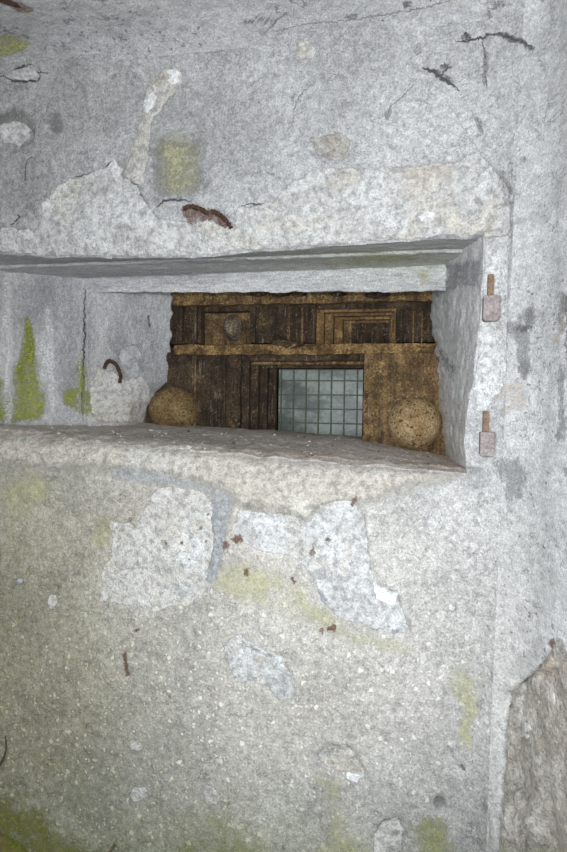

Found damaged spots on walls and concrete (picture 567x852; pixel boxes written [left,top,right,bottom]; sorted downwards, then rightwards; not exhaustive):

rust [0,0,33,13]
crack [0,64,48,83]
crack [384,63,460,120]
crack [455,31,535,88]
rust [182,204,233,229]
spalling [0,68,514,411]
damp [2,273,11,423]
damp [38,309,58,411]
spalling [89,344,151,423]
spalling [499,638,567,852]